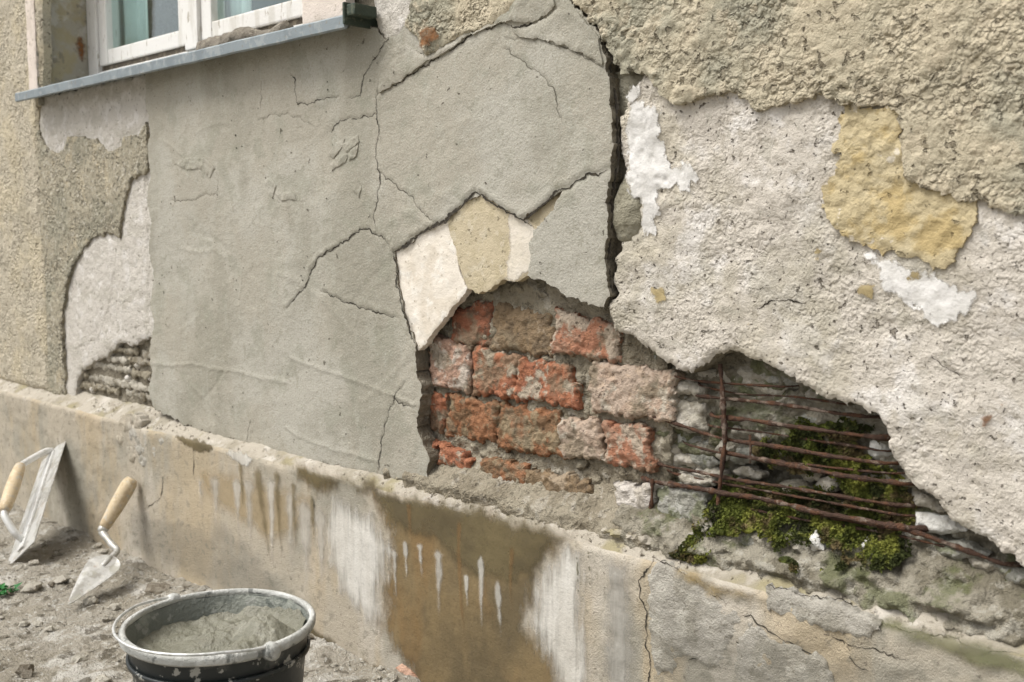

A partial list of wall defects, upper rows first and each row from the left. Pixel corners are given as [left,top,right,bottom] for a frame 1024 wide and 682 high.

flaking render [39,104,147,150]
flaking render [67,176,165,350]
crack [260,18,620,343]
peeling [821,102,978,271]
crack [378,388,411,464]
flaking render [383,194,718,551]
rust [640,364,1023,567]
damp [136,606,335,653]
damp [199,450,590,682]
crack [638,557,909,682]